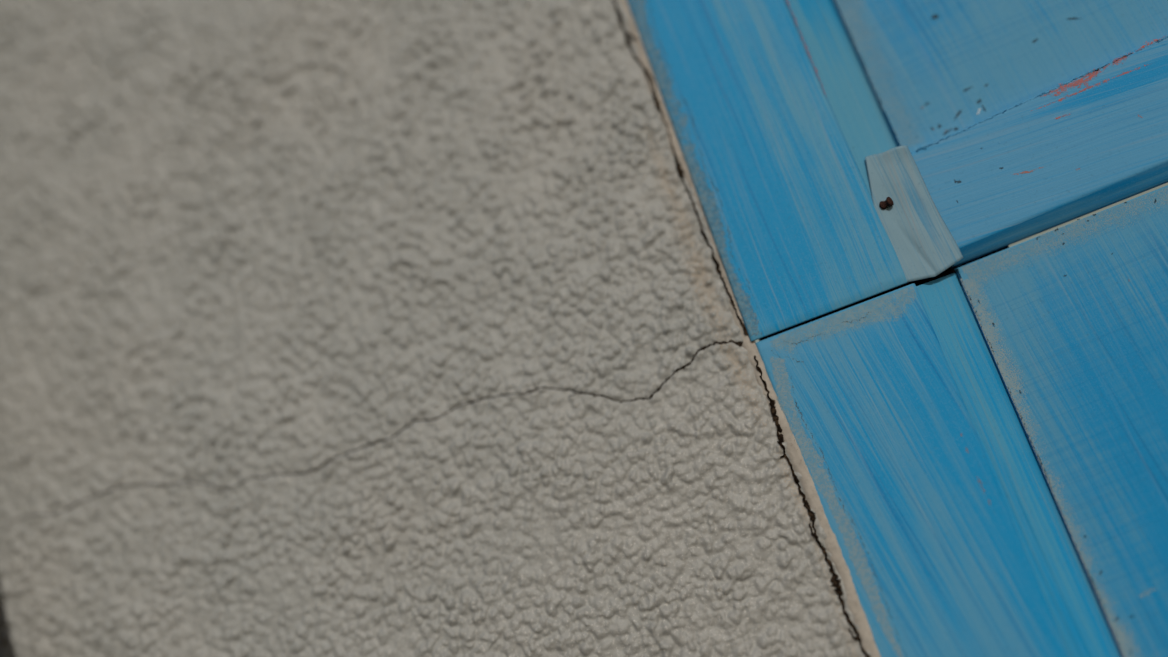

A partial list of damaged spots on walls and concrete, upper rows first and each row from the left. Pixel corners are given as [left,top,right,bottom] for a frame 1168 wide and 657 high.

crack [0,0,871,657]